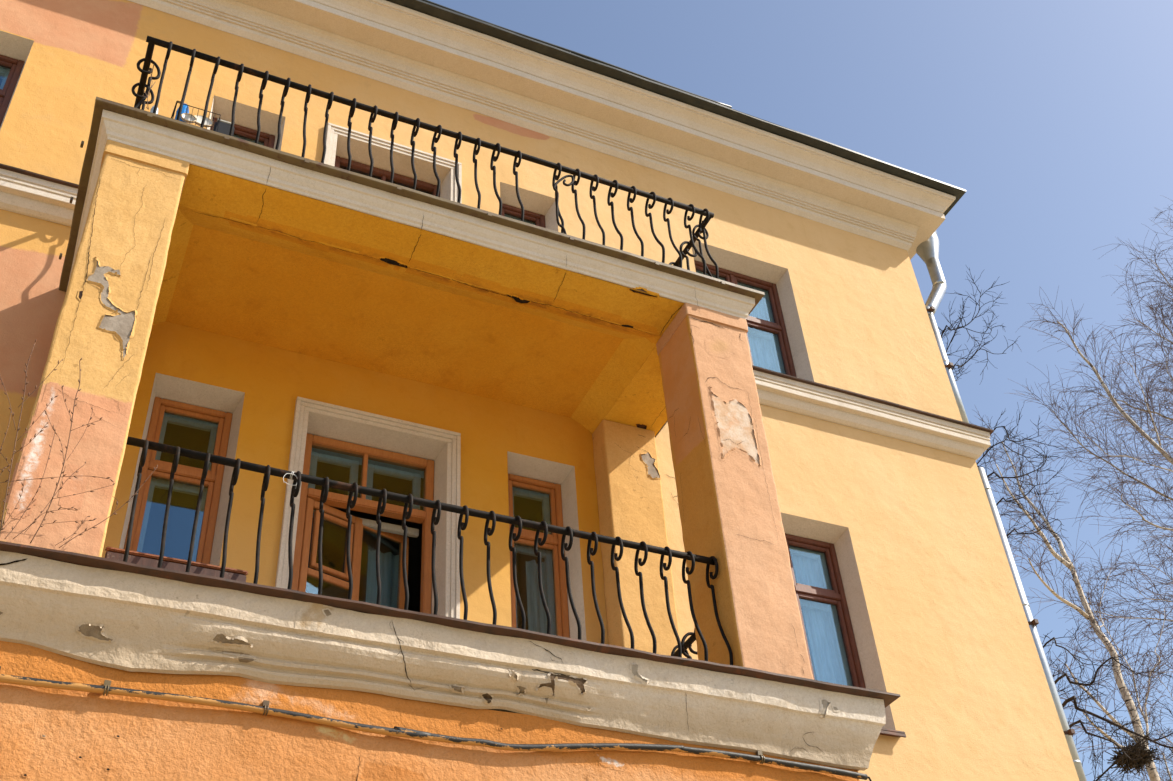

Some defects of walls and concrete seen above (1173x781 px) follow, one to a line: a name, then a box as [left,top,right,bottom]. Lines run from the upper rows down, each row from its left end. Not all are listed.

crack [64,158,172,360]
peeling [86,257,137,360]
peeling [707,384,763,469]
peeling [639,451,661,480]
peeling [76,622,116,643]
peeling [209,632,258,664]
crack [389,622,429,690]
spalling [507,668,592,711]